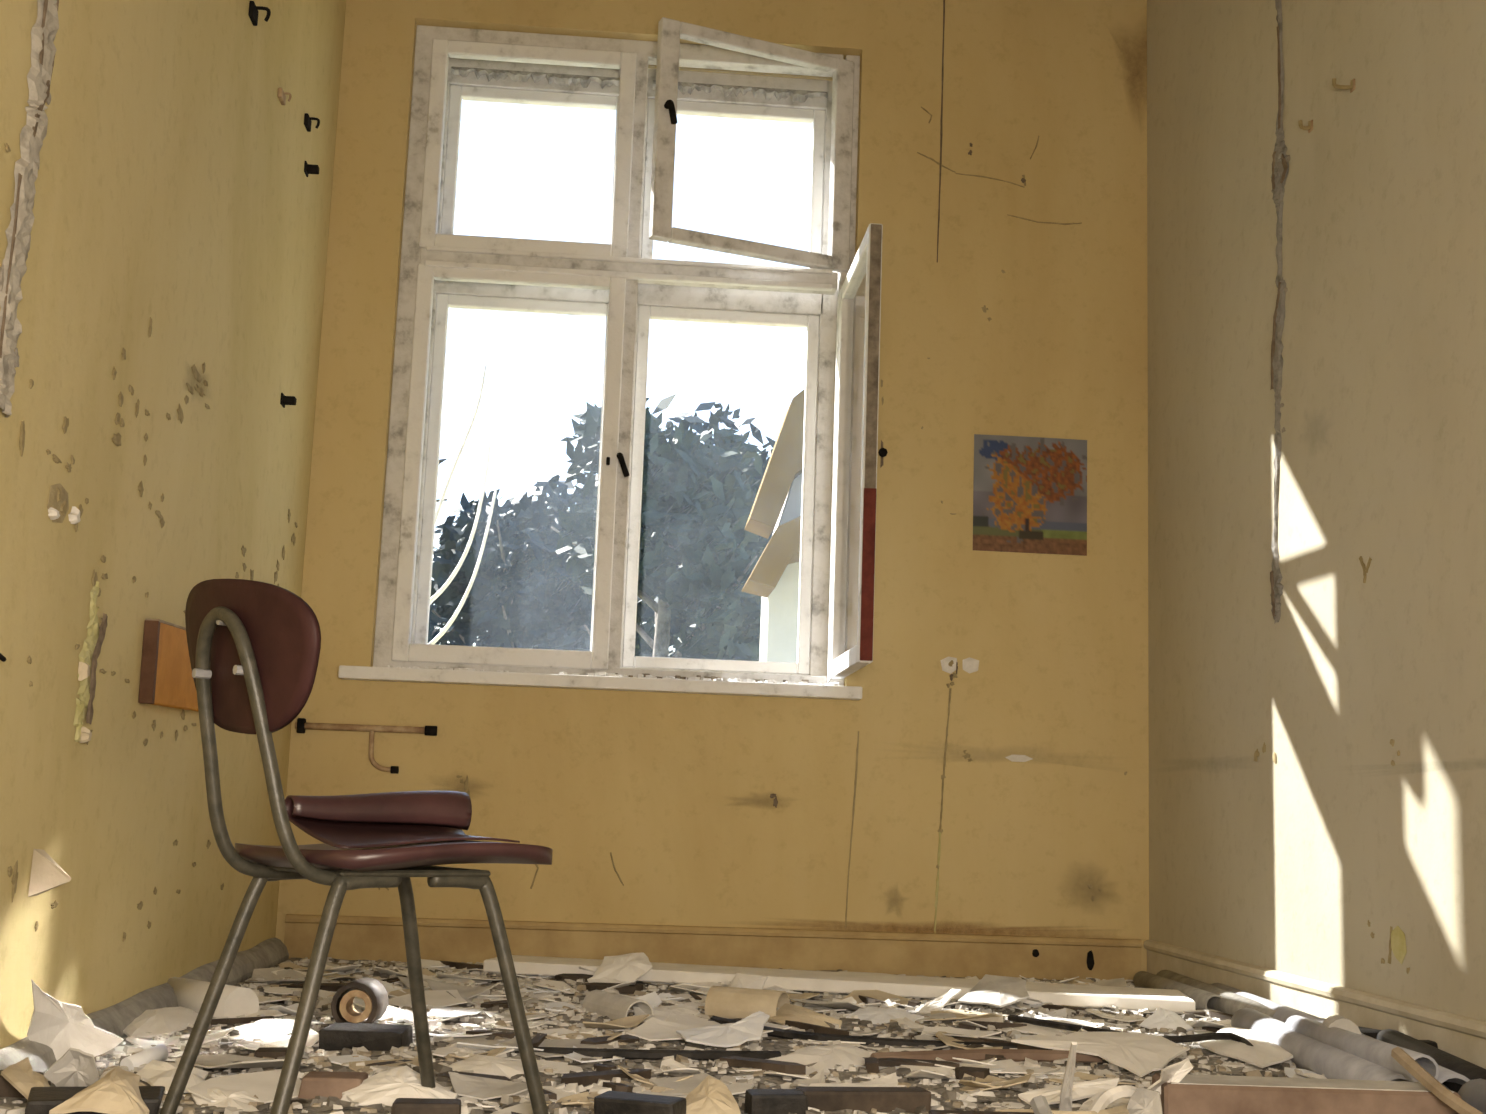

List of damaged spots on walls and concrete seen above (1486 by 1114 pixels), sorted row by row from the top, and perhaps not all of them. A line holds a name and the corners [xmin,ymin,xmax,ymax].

crack [1270,0,1290,624]
flaking render [46,449,89,532]
peeling [73,555,130,745]